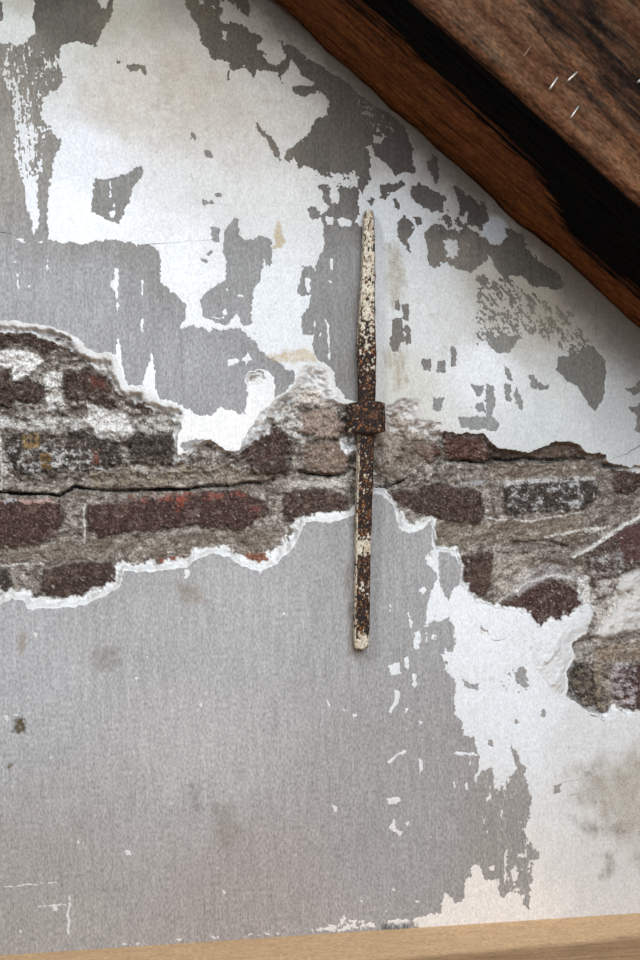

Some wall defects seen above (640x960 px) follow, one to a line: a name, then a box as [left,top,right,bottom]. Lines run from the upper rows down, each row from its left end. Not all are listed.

peeling [337,217,352,227]
peeling [489,228,564,290]
peeling [486,327,521,353]
peeling [228,352,252,366]
peeling [556,343,607,411]
peeling [459,384,499,431]
crack [0,475,270,508]
peeling [413,631,436,649]
peeling [388,657,417,687]
peeling [389,690,408,713]
peeling [501,849,523,886]
peeling [37,895,71,935]